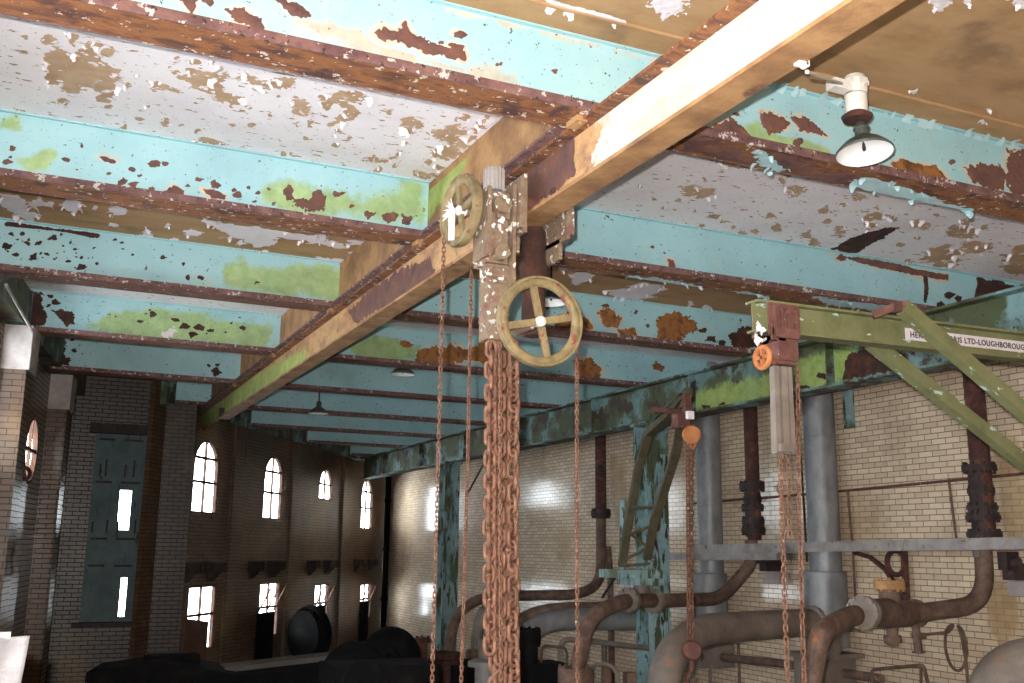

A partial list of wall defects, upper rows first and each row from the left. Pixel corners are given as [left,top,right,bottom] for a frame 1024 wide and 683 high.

corrosion [166,0,656,90]
peeling [21,32,373,148]
peeling [0,193,127,227]
peeling [138,218,364,262]
leakage [214,250,340,301]
leakage [247,153,472,230]
peeling [361,110,491,179]
corrosion [681,104,860,184]
peeling [651,177,1024,276]
corrosion [884,142,1024,196]
corrosion [545,302,760,349]
leakage [77,302,310,430]